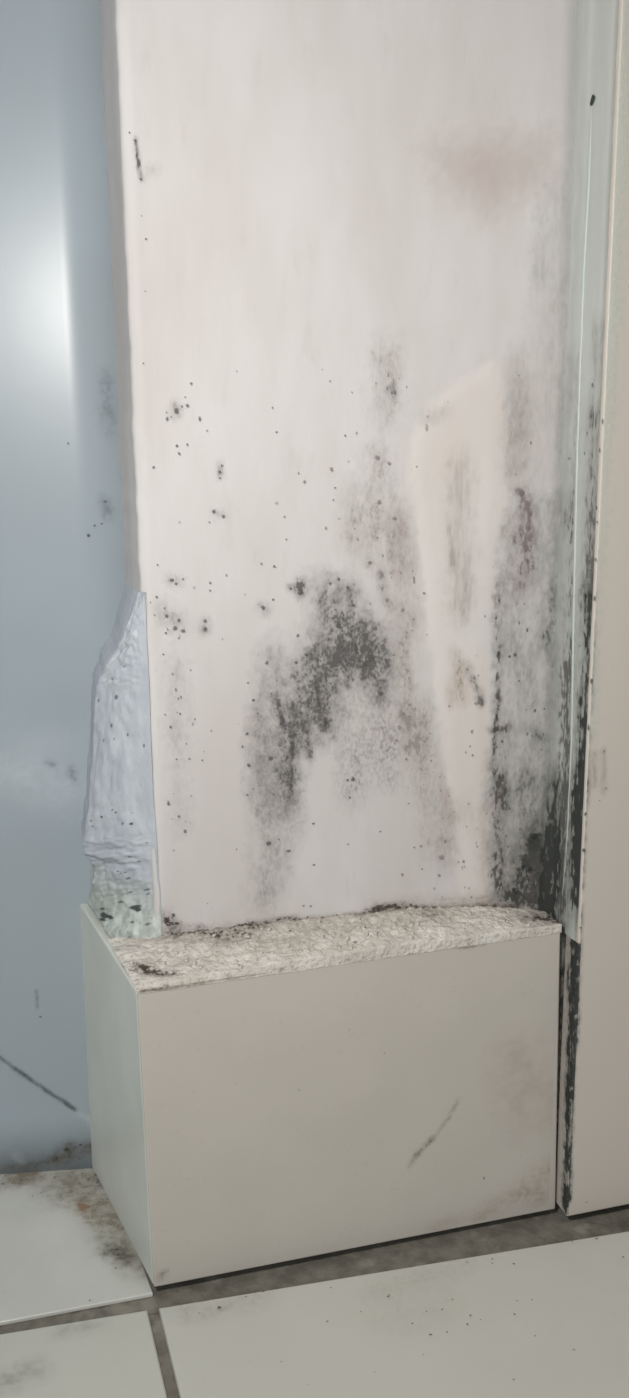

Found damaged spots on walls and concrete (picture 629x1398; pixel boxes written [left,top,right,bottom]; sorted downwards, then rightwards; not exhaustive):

leakage [134,964,175,975]
leakage [188,924,259,940]
leakage [247,555,434,810]
leakage [501,406,603,1214]